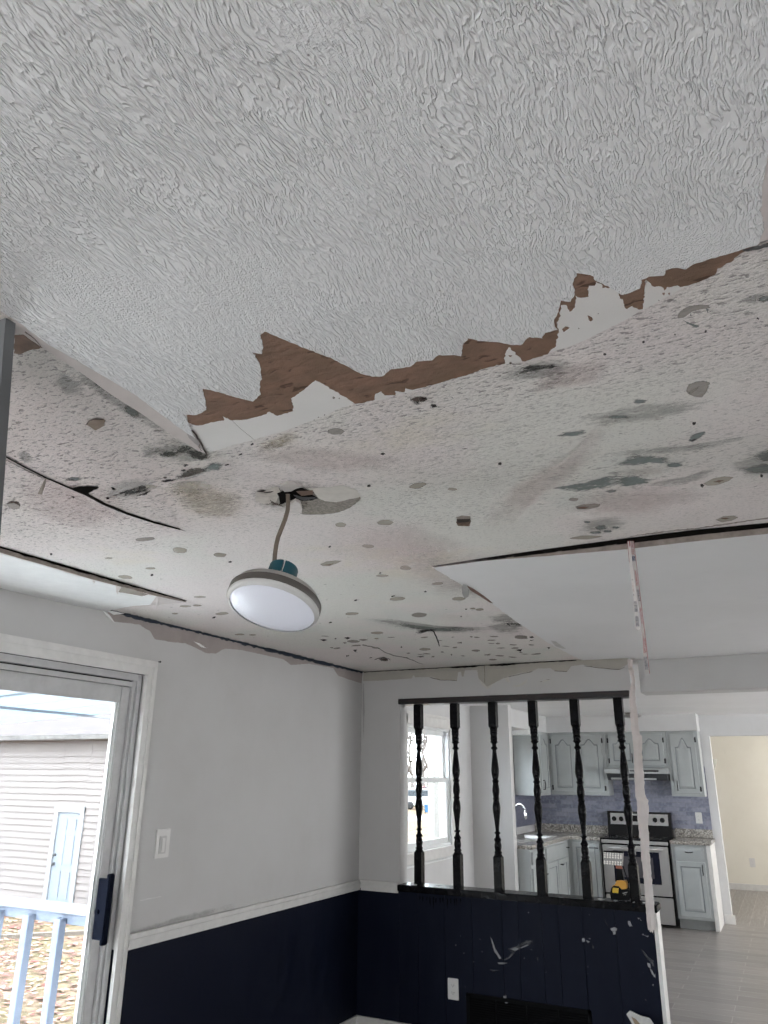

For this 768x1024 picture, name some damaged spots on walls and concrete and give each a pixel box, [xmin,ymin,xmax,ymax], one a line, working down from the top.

leakage [520,365,557,374]
mould [114,446,222,496]
mould [556,455,682,493]
mould [745,452,768,473]
crack [6,456,184,531]
peeling [255,487,280,504]
peeling [308,485,360,502]
crack [630,517,768,537]
leakage [397,624,540,660]